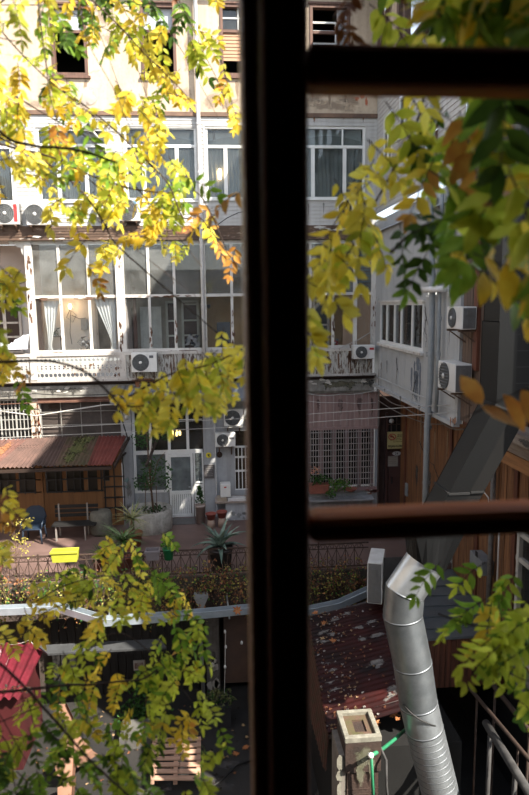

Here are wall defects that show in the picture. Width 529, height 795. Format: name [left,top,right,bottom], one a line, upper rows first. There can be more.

peeling [327,345,351,373]
leakage [356,759,376,785]